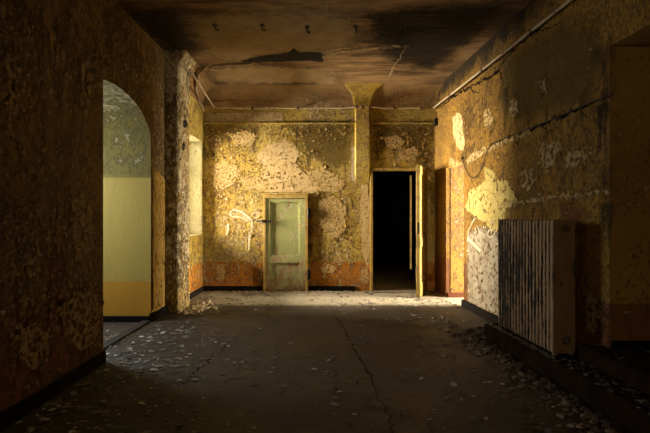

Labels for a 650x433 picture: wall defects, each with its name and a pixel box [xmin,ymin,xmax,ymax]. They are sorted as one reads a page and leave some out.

peeling [203,126,370,286]
flaking render [370,60,609,315]
crack [231,303,394,433]